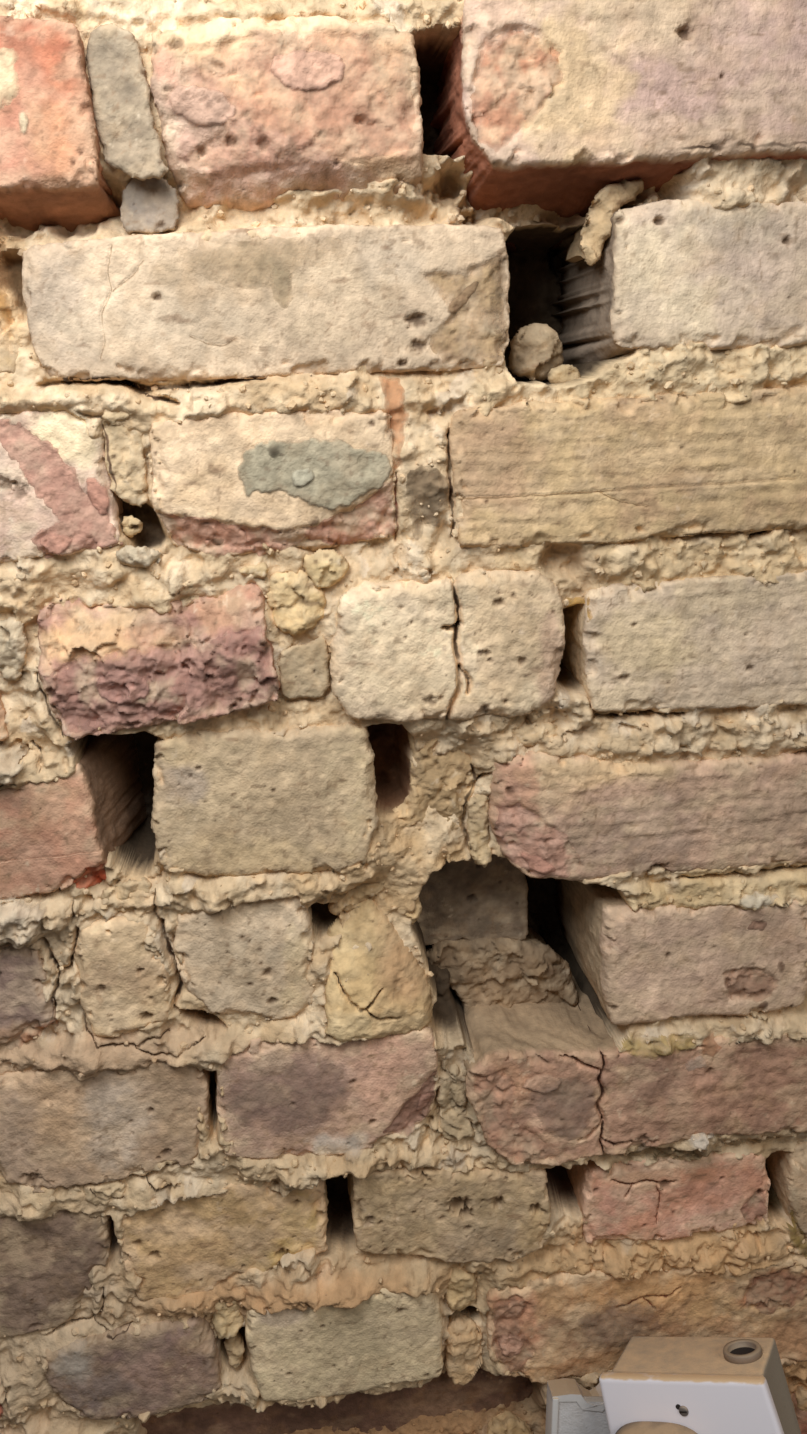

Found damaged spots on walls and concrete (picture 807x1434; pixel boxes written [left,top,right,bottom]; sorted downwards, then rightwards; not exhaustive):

spalling [431,222,585,358]
spalling [511,355,626,386]
spalling [556,659,584,693]
spalling [43,627,268,889]
spalling [367,723,415,815]
crack [50,888,206,1055]
crack [335,973,393,1018]
spalling [414,921,471,1041]
spalling [494,803,628,1049]
crack [573,1002,660,1223]
spalling [741,1160,791,1225]